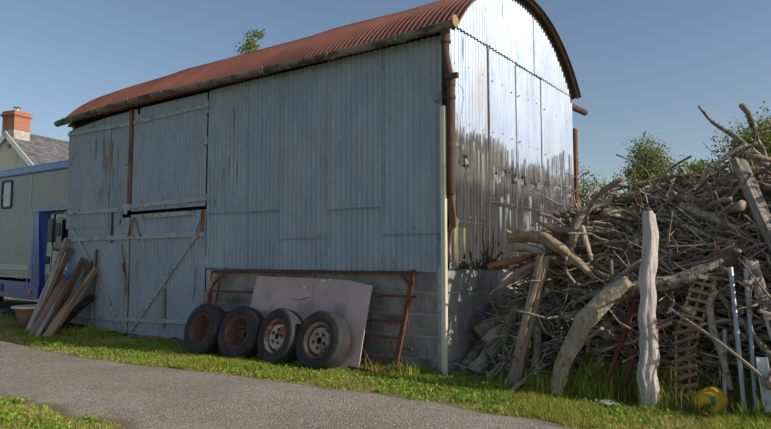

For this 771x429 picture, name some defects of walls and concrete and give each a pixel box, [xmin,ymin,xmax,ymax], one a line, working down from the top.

damp [451,129,574,269]